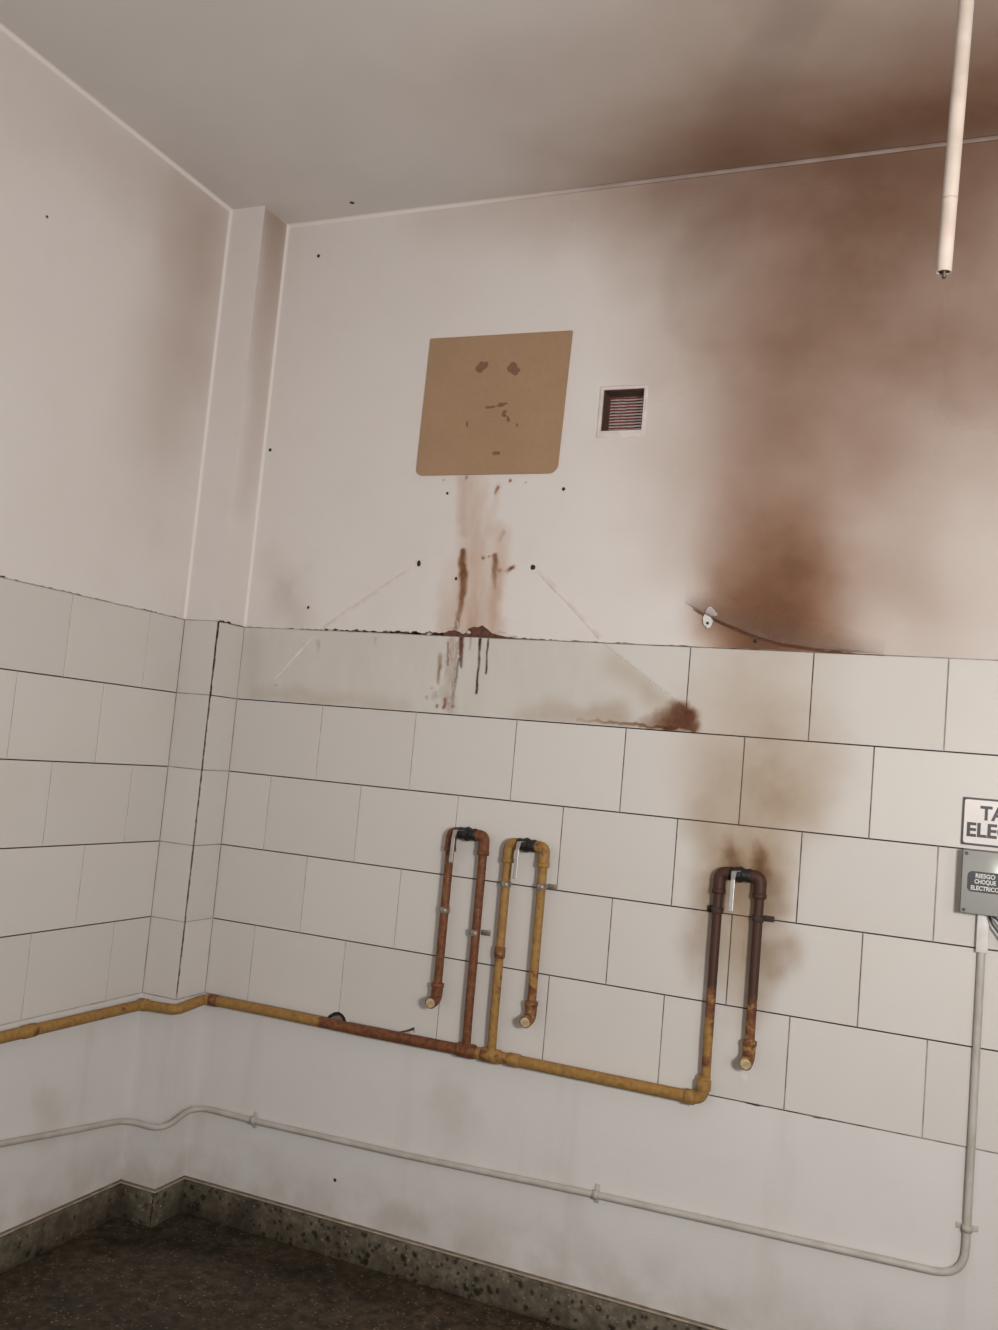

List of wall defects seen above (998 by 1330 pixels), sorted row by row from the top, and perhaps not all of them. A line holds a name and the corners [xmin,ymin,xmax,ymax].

corrosion [458,637,489,694]
corrosion [652,704,696,732]